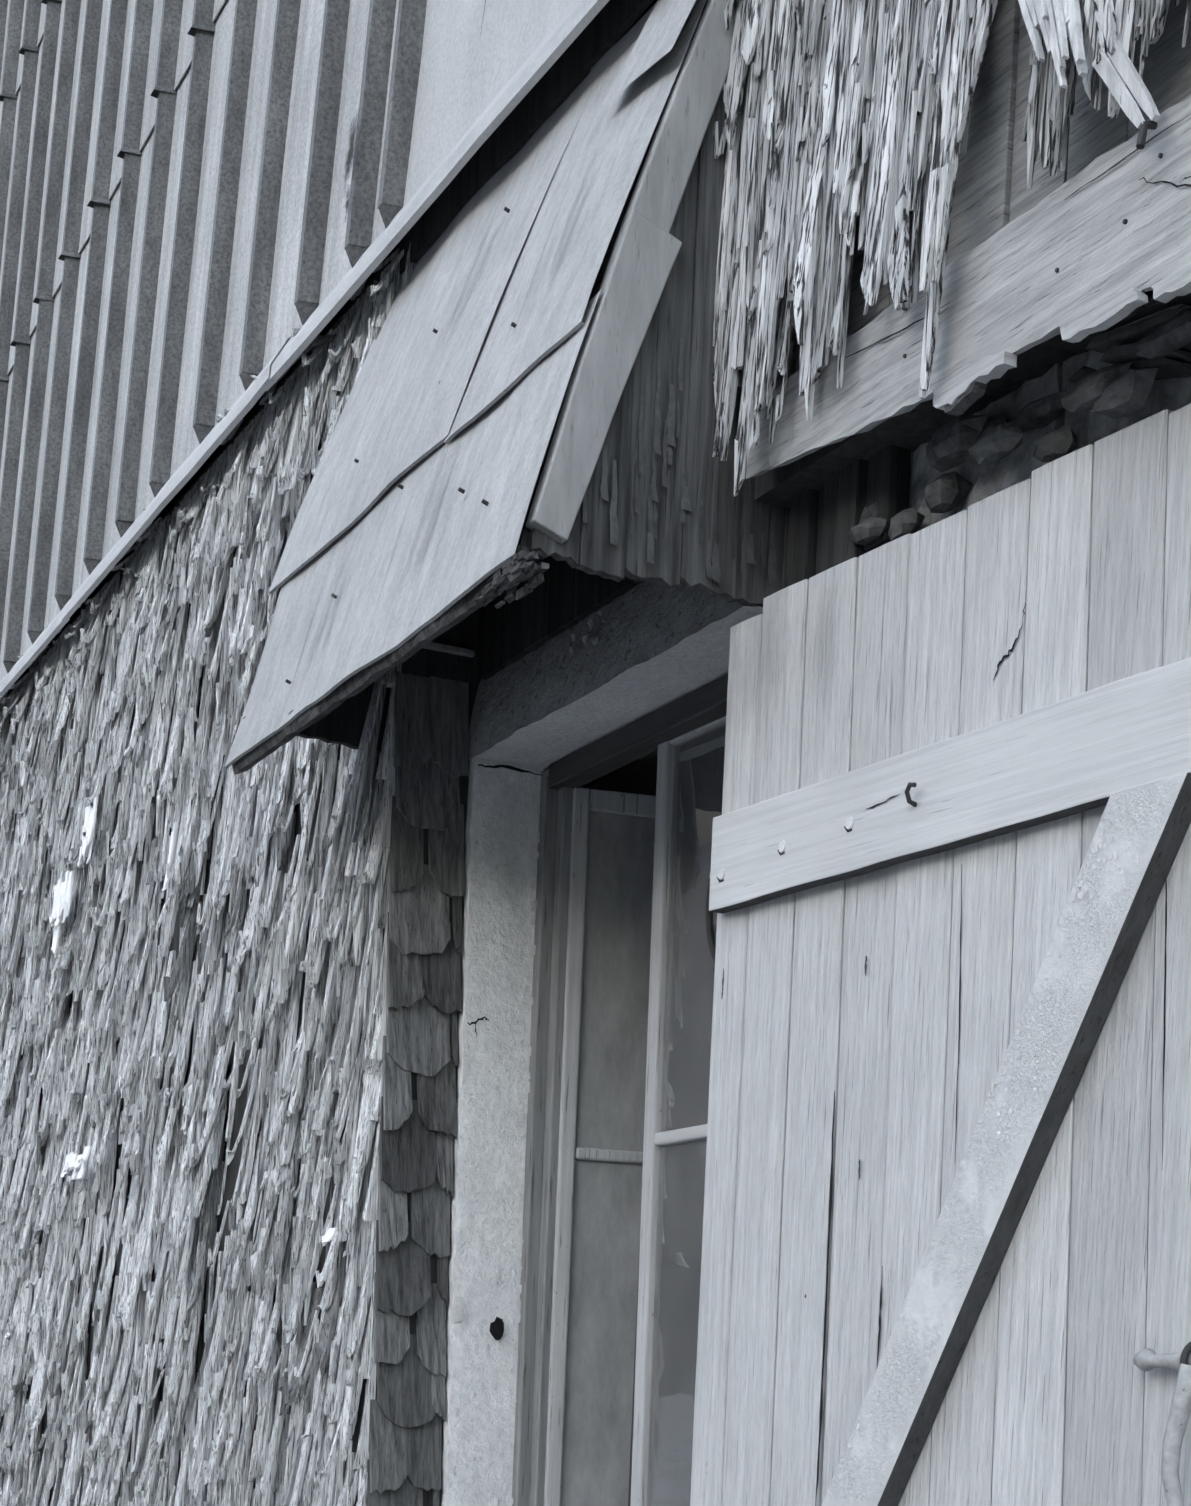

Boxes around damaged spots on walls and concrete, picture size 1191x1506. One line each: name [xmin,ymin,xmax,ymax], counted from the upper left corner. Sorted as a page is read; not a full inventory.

crack [1065,114,1191,200]
crack [993,603,1026,681]